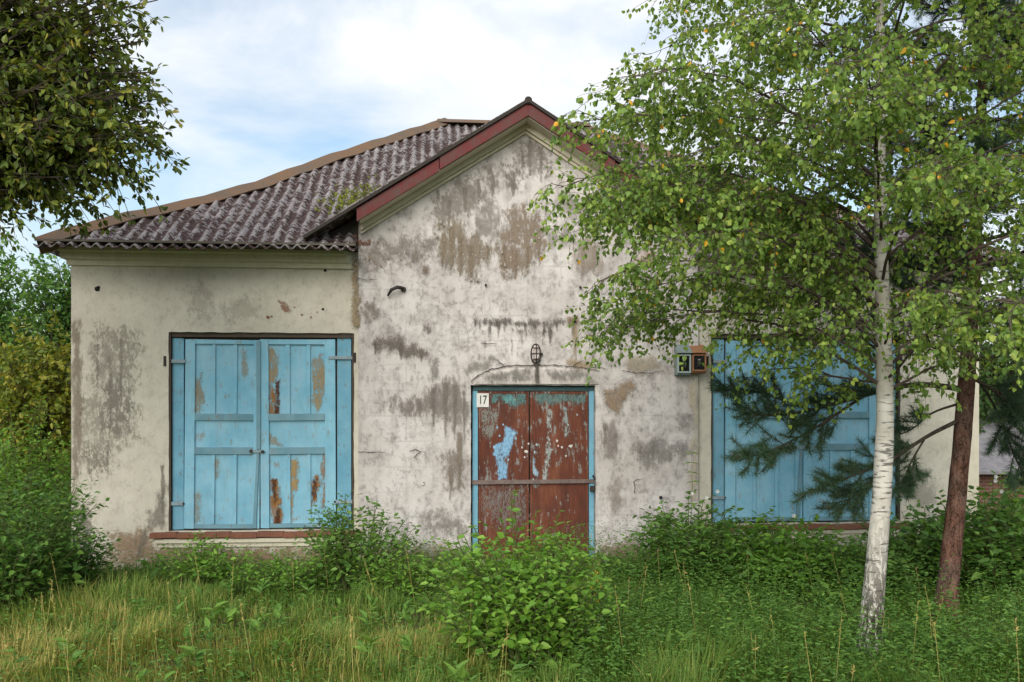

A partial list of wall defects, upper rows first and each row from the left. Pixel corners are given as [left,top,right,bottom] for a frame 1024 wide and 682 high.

damp [358,140,552,274]
damp [474,317,566,342]
corrosion [269,348,280,414]
corrosion [312,354,325,414]
damp [371,333,594,495]
peeling [481,391,586,480]
damp [631,413,690,470]
corrosion [270,455,325,524]